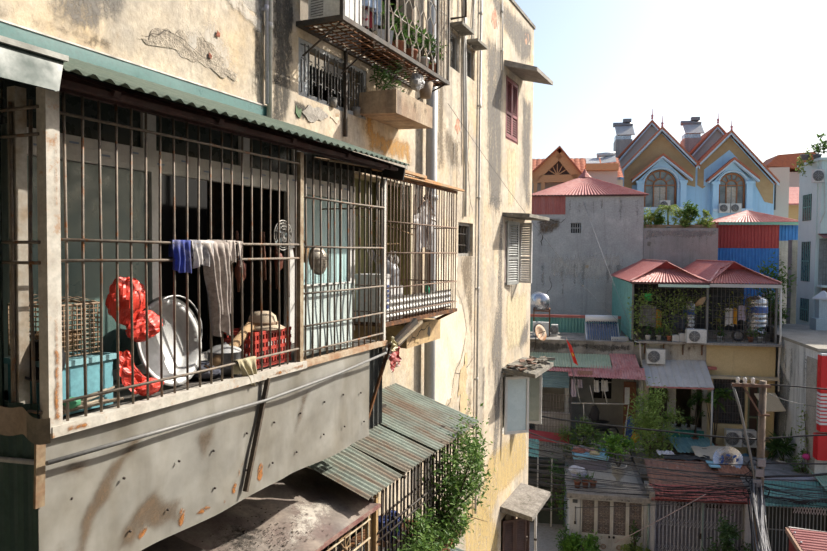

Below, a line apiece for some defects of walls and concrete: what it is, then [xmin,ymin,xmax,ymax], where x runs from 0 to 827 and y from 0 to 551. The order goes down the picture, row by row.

damp [55,0,123,27]
flaking render [141,25,237,82]
damp [273,0,293,120]
damp [81,440,138,549]
damp [124,495,177,542]